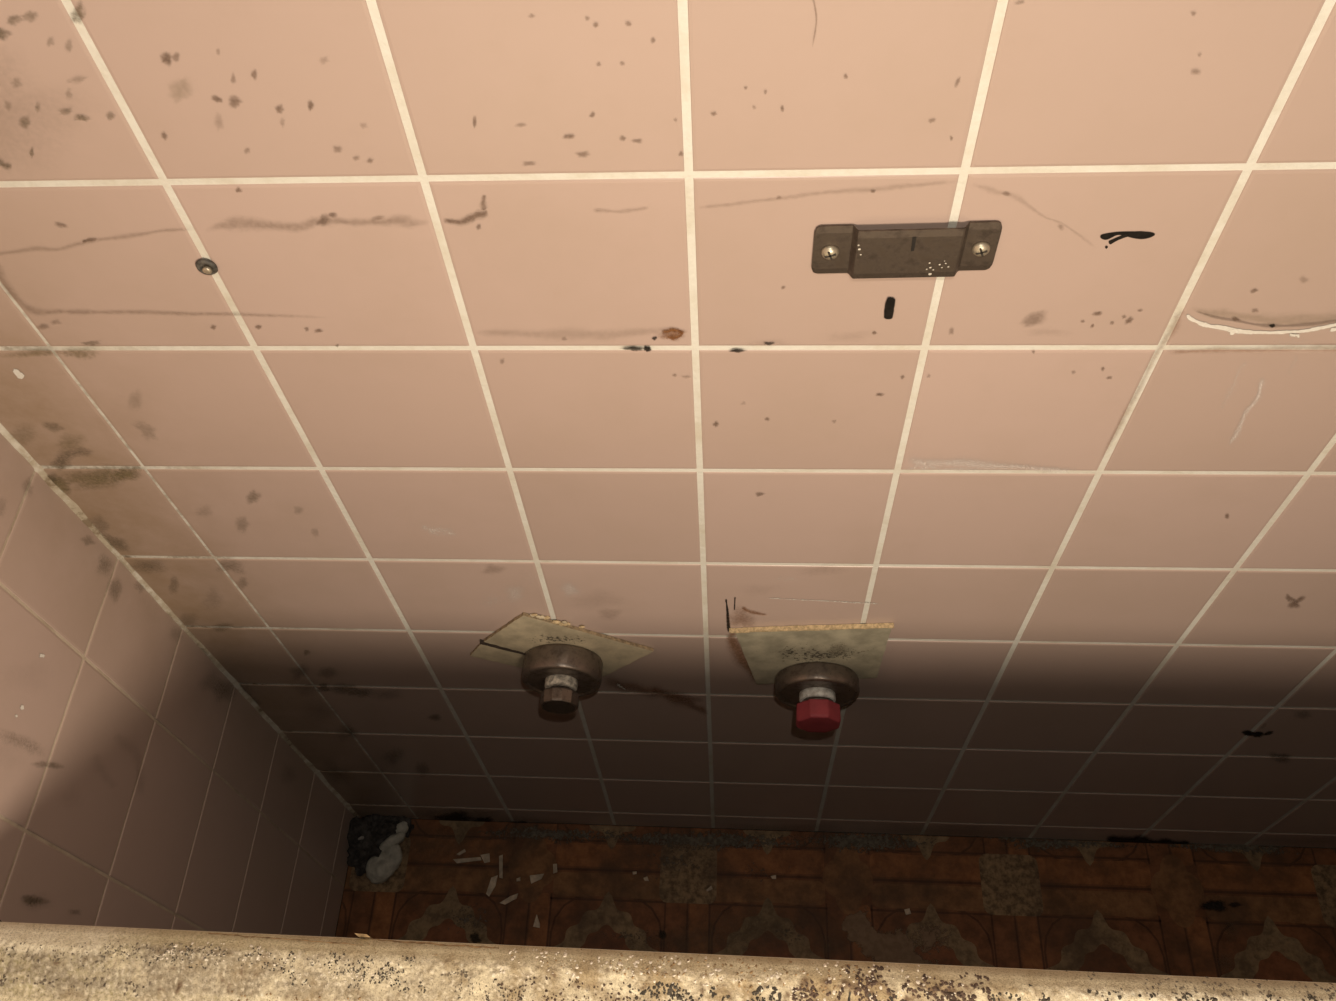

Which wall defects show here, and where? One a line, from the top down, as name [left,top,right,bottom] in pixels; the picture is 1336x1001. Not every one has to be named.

damp [747,911,1050,1001]
damp [441,969,731,1001]
damp [1138,976,1336,1001]